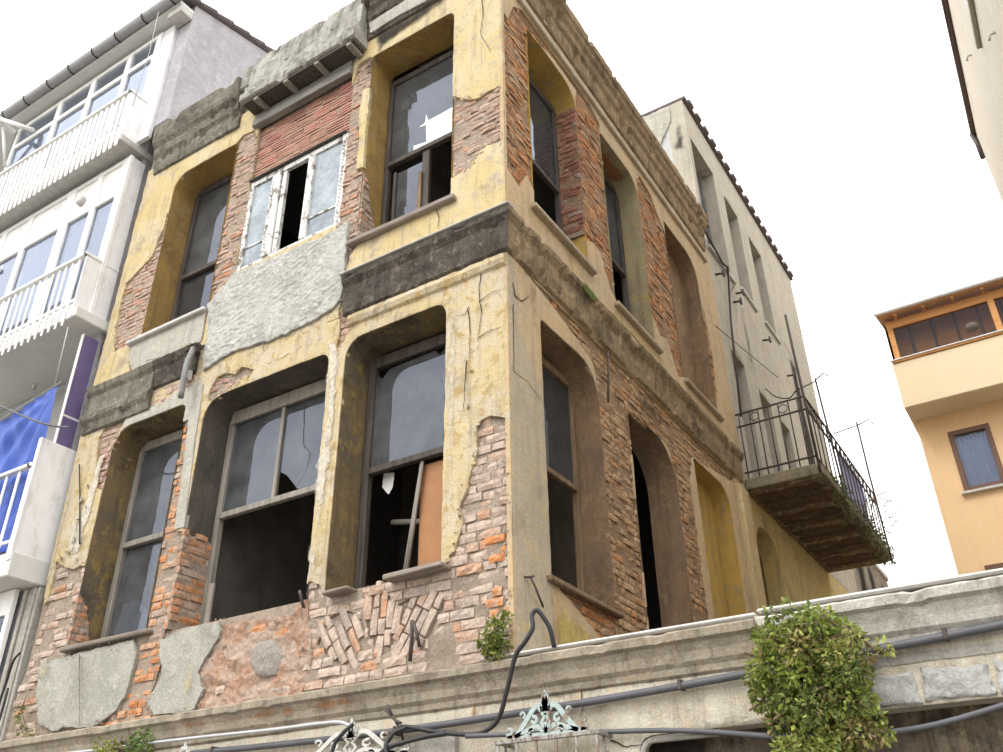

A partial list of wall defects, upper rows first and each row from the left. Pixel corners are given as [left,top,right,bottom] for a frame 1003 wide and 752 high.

spalling [5,420,132,741]
spalling [115,218,168,351]
spalling [103,422,211,726]
spalling [210,368,253,400]
peeling [316,303,350,523]
spalling [198,418,509,709]
spalling [335,59,375,265]
crack [458,273,529,412]
spalling [452,8,613,293]
spalling [540,290,731,638]